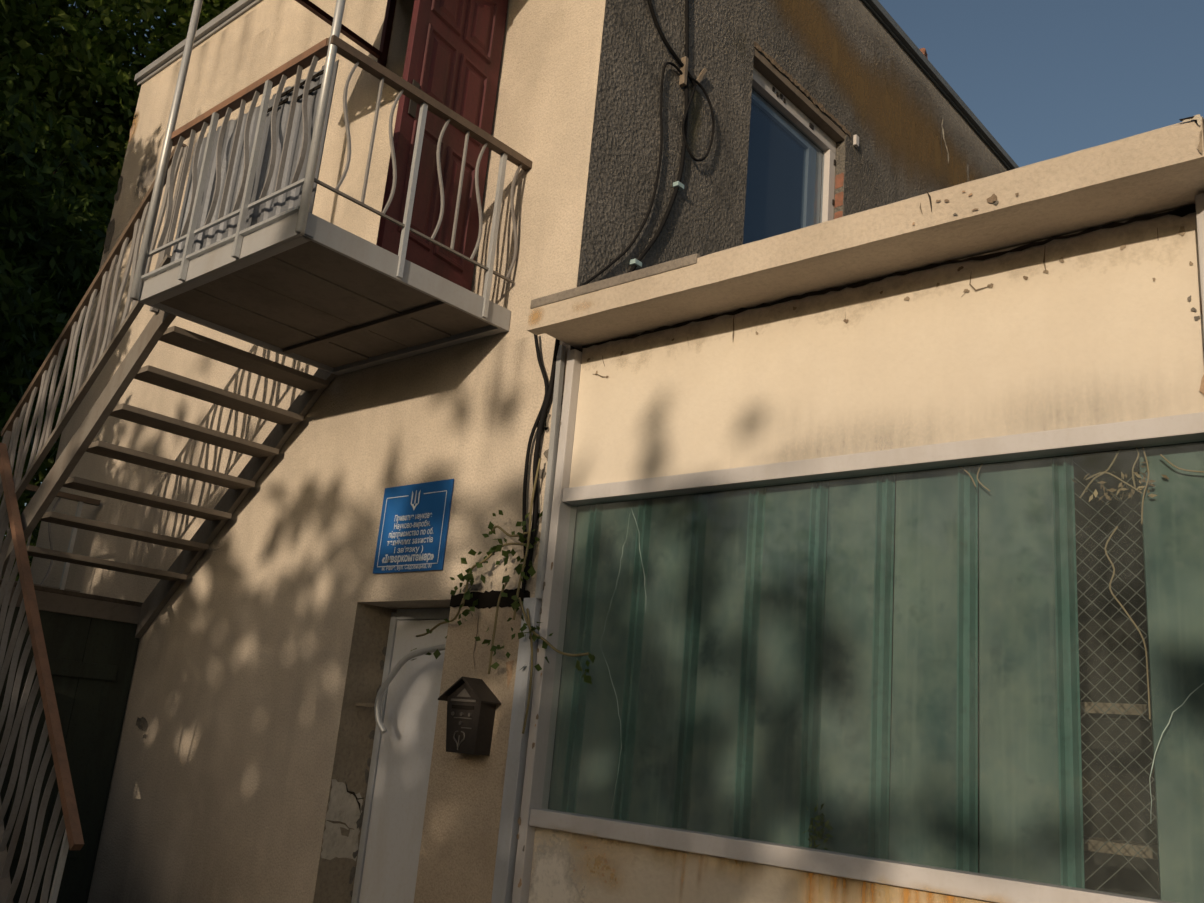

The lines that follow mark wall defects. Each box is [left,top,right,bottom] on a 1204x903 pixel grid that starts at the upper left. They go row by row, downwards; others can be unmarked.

spalling [1166,204,1196,236]
flaking render [321,757,371,897]